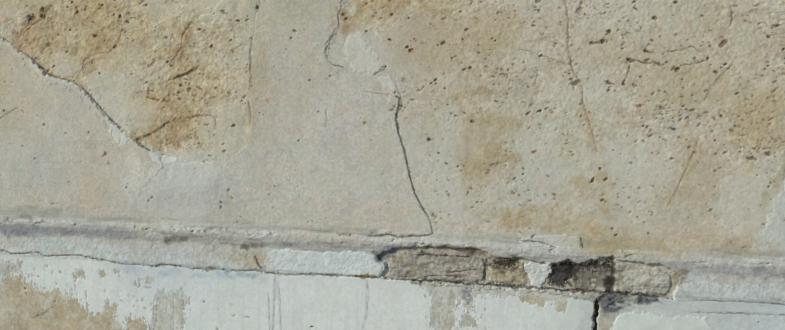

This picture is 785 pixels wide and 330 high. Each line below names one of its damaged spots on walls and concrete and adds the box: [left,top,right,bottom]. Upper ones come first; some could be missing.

spalling [0,0,397,191]
crack [0,68,785,330]
peeling [519,234,583,250]
peeling [0,259,191,330]
spalling [267,247,713,330]